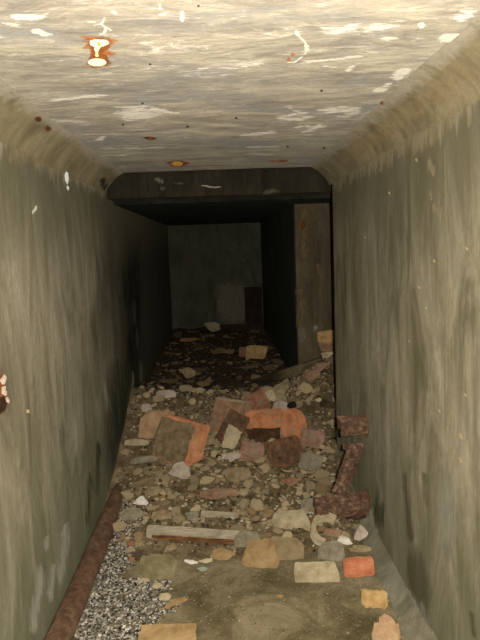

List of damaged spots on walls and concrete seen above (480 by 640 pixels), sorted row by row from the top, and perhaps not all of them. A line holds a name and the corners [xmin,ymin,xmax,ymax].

rust [81,36,116,68]
spalling [0,374,10,414]